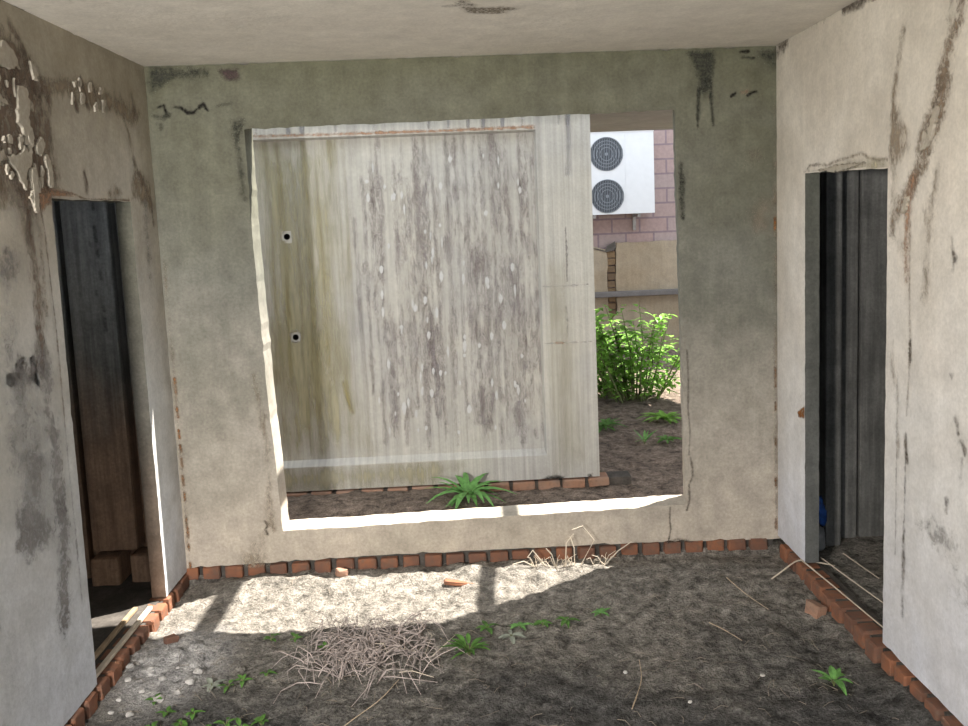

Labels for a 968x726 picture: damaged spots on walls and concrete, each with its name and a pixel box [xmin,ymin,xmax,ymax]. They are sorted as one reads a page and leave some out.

peeling [0,40,57,213]
damp [460,0,510,14]
damp [690,51,714,127]
crack [842,0,863,13]
crack [891,0,964,281]
damp [10,184,71,635]